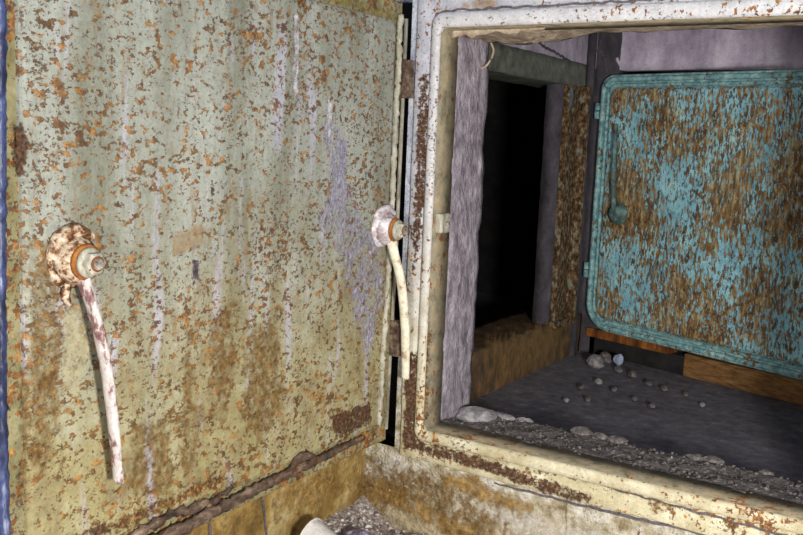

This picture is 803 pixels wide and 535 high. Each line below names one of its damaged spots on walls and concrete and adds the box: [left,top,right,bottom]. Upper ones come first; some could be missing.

corrosion [411,74,430,271]
corrosion [585,327,687,375]
corrosion [330,402,372,438]
corrosion [401,330,591,504]
corrosion [76,470,224,535]
water stain [363,455,533,535]
corrosion [648,500,674,514]